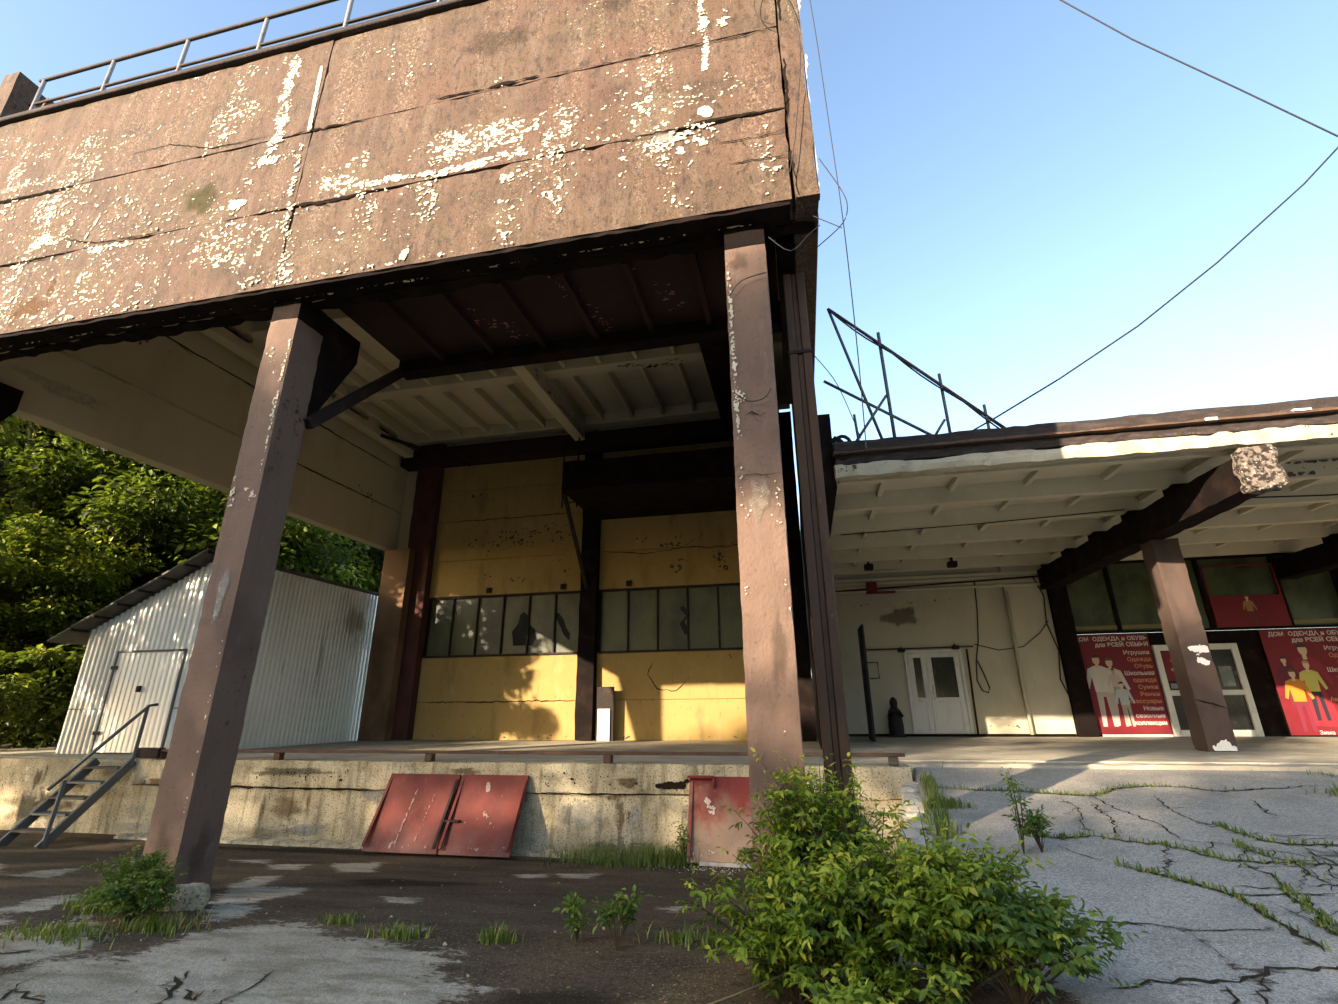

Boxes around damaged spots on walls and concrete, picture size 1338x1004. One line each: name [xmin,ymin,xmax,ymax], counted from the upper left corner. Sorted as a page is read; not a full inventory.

crack [0,186,71,203]
crack [133,138,259,154]
crack [294,120,362,135]
crack [292,188,381,207]
peeling [0,0,744,349]
peeling [750,124,782,194]
crack [0,226,182,266]
spalling [727,272,746,436]
crack [1015,785,1338,1004]
crack [0,950,48,1004]
crack [159,971,272,1004]